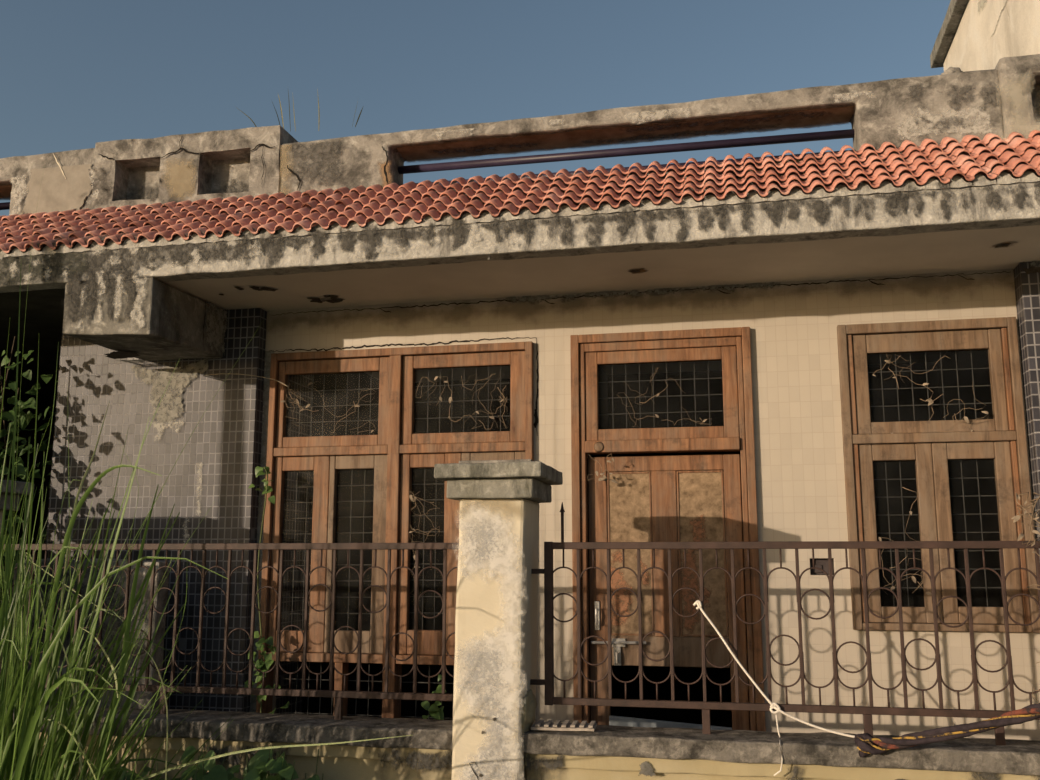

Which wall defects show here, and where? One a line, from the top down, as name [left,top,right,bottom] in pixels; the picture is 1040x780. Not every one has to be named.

crack [161,137,203,158]
crack [249,144,301,190]
damp [290,141,344,184]
crack [381,146,389,184]
damp [240,181,1040,268]
damp [65,269,146,331]
spalling [307,295,345,303]